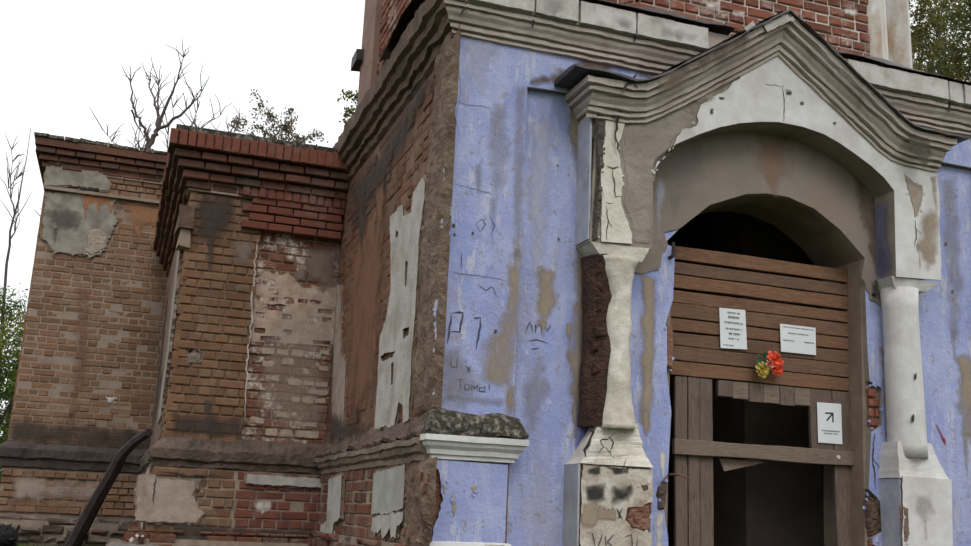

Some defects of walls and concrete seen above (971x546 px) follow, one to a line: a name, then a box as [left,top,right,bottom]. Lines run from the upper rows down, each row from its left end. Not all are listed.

flaking render [40,166,119,260]
water stain [330,81,428,444]
spalling [375,23,461,430]
crack [594,73,638,237]
spalling [904,174,927,217]
water stain [12,421,151,448]
flaking render [105,462,205,546]
peeling [245,269,349,439]